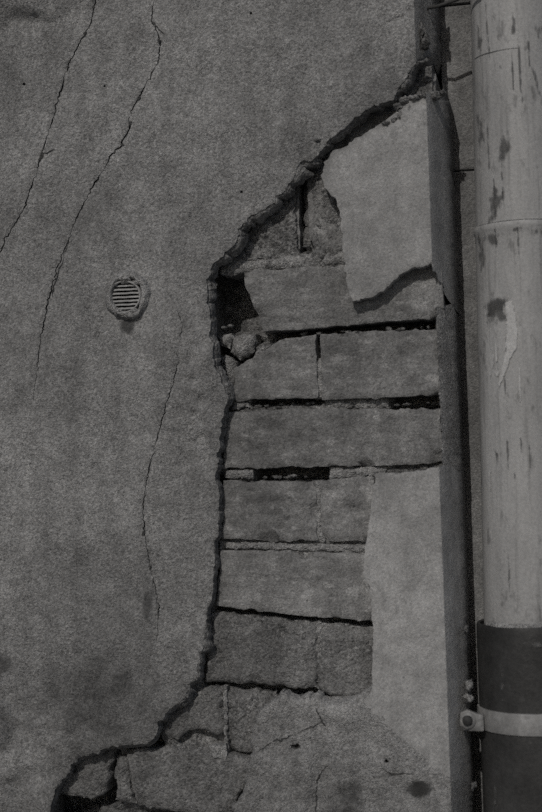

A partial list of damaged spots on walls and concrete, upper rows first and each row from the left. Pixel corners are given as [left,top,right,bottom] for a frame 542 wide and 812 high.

crack [0,142,55,253]
crack [42,0,164,332]
crack [142,313,182,636]
flaking render [51,21,434,812]
flaking render [228,686,476,812]